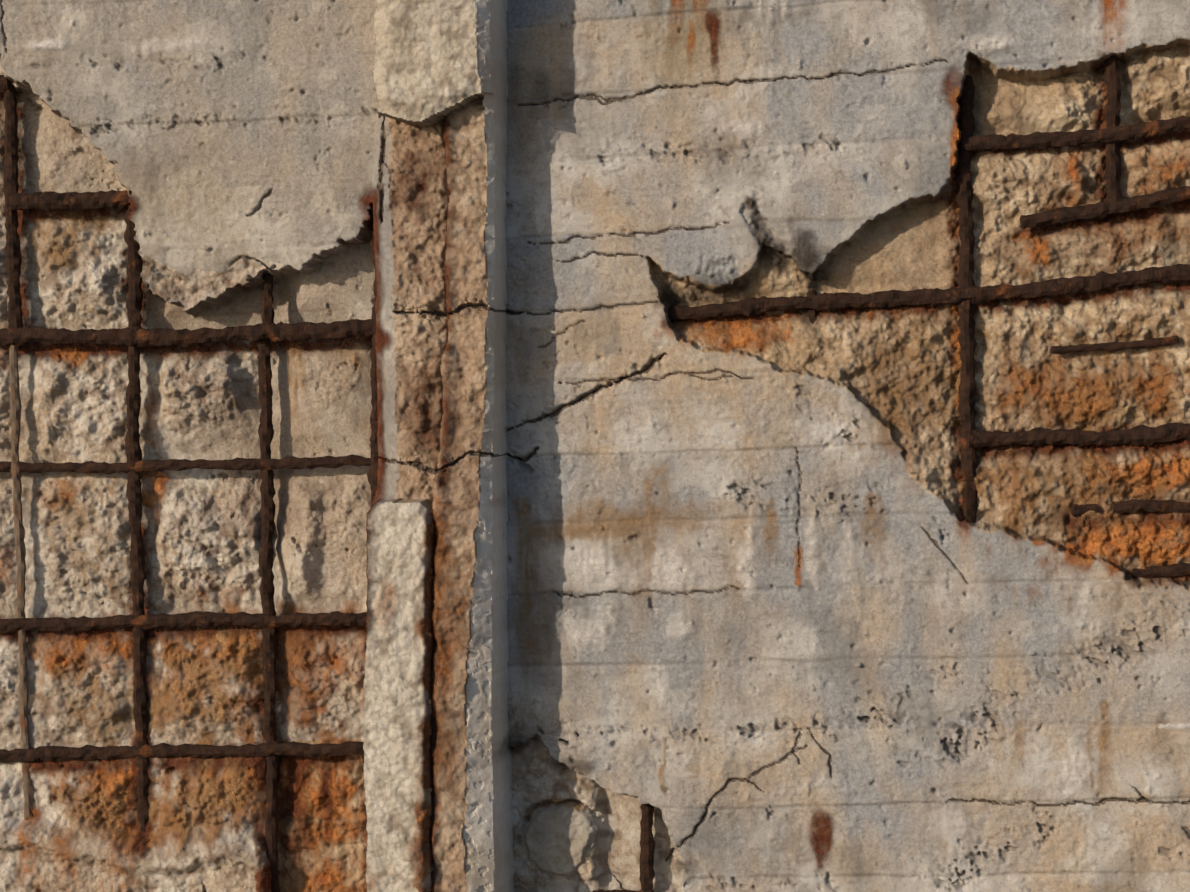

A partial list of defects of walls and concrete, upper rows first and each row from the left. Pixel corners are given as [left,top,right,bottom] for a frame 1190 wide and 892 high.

crack [518,59,948,106]
rust [976,280,1190,311]
rust [0,189,390,892]
spalling [0,49,488,892]
rust [418,512,467,698]
crack [385,353,754,474]
rust [661,304,980,531]
spalling [507,38,1190,892]
rust [978,365,1190,585]
crack [666,728,832,861]
rust [811,813,832,868]
crack [943,786,1190,807]